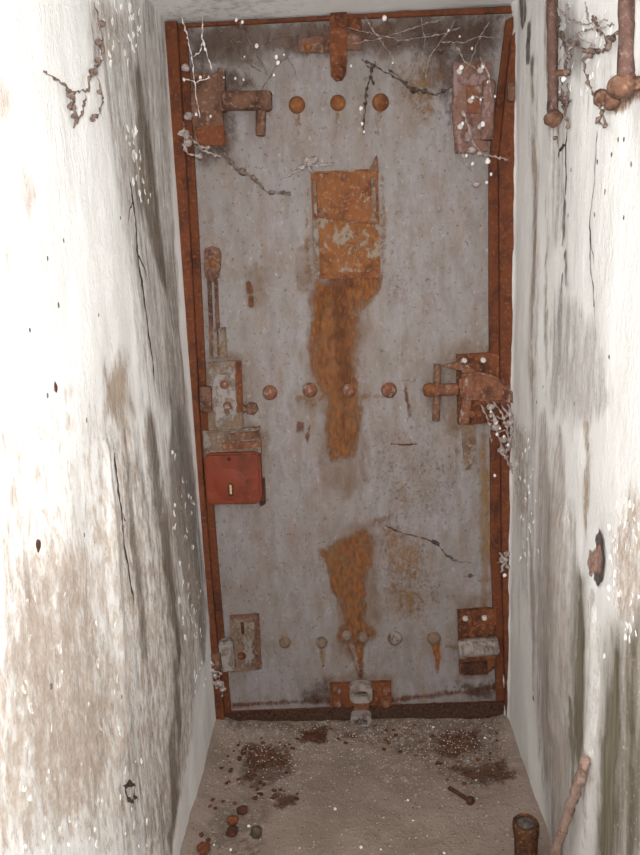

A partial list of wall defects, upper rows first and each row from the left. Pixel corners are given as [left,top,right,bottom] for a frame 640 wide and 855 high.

damp [104,358,134,452]
crack [128,178,154,374]
corrosion [295,239,382,461]
damp [531,141,547,333]
crack [113,443,134,602]
damp [131,522,141,595]
damp [148,413,189,854]
damp [170,393,210,634]
corrosion [320,529,376,678]
corrosion [432,644,456,669]
damp [531,435,634,855]
spalling [587,497,640,644]